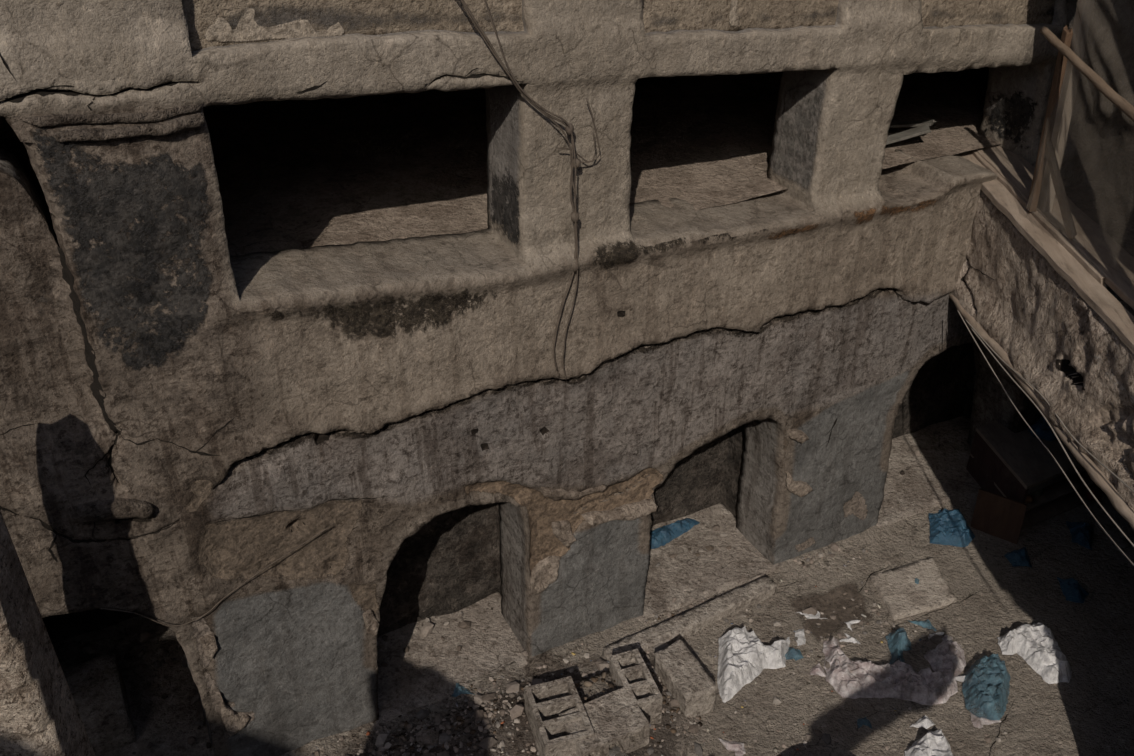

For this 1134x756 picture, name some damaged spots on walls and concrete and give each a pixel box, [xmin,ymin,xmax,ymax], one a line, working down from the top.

crack [296,80,328,93]
crack [428,68,519,86]
leakage [271,289,497,339]
crack [57,247,234,486]
flaking render [464,468,664,593]